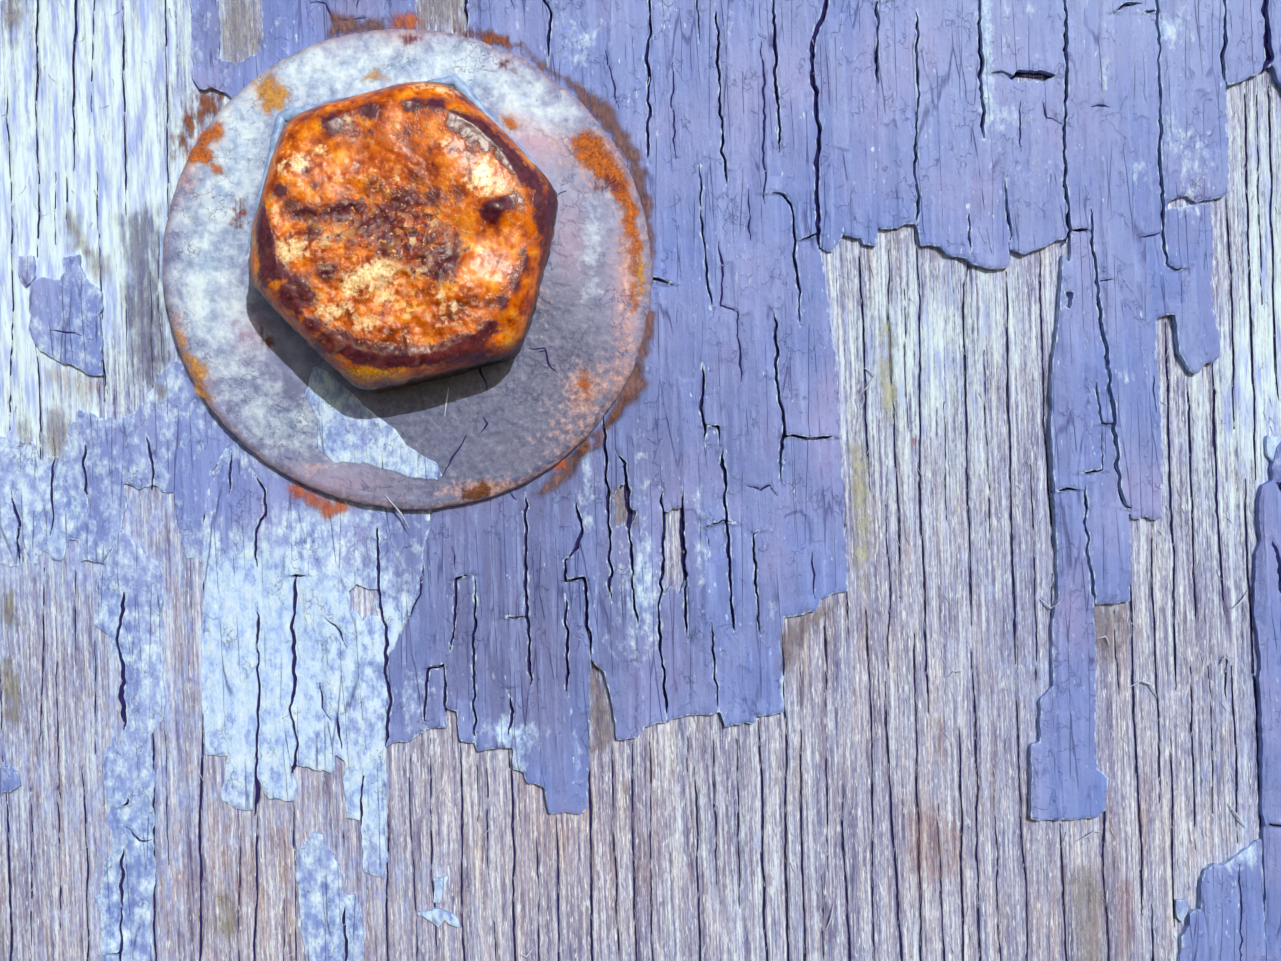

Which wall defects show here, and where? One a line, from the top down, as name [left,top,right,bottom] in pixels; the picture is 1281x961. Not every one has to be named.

rust [258,76,288,112]
peeling [190,0,418,98]
crack [311,0,366,22]
peeling [18,254,104,376]
peeling [386,0,1281,821]
crack [343,0,1281,961]
peeling [0,361,442,961]
peeling [1174,435,1281,961]
peeling [418,875,460,928]